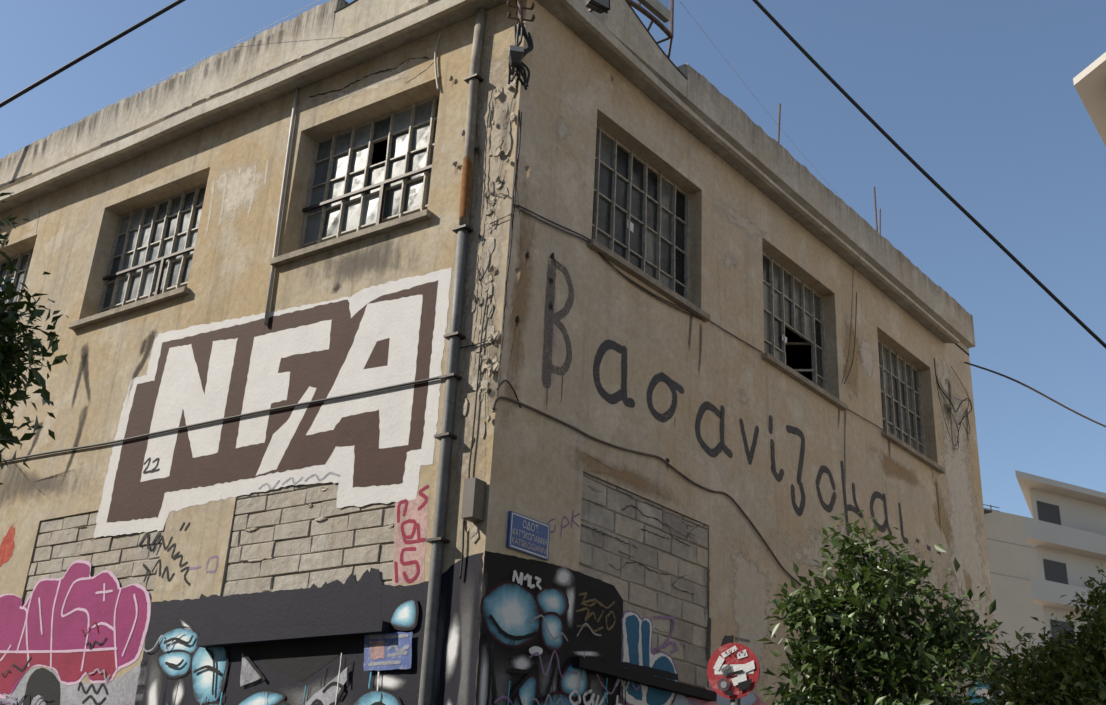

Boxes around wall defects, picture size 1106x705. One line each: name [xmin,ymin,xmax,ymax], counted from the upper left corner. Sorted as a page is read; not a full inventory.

corrosion [455,151,480,217]